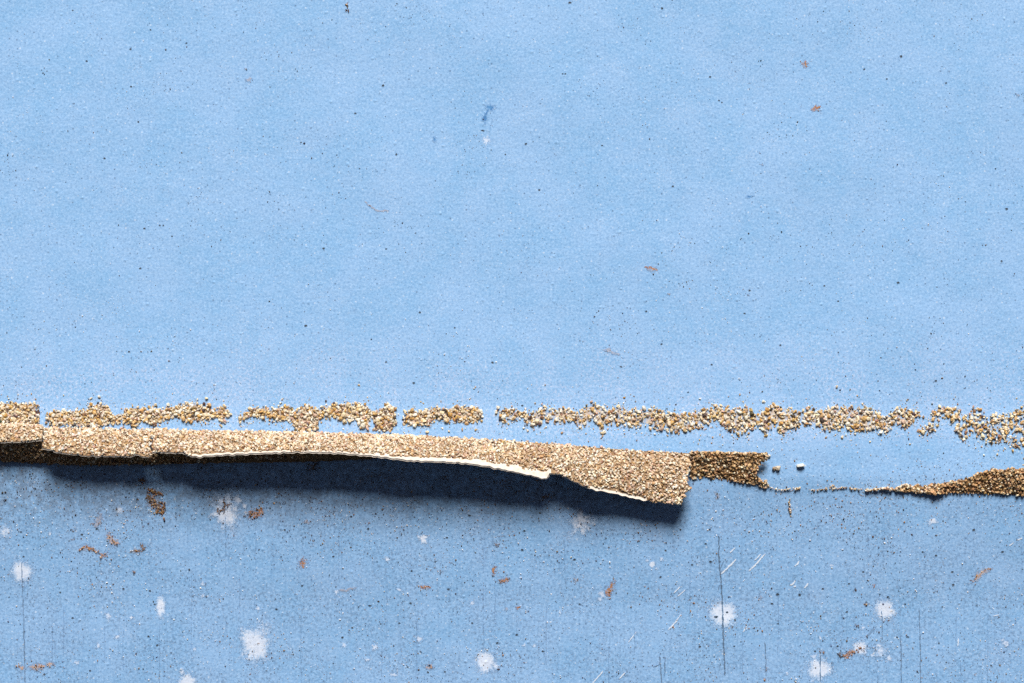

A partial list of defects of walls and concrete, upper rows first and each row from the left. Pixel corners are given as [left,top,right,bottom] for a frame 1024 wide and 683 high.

water stain [7,554,36,586]
water stain [233,606,278,680]
water stain [703,595,744,630]
water stain [851,594,903,661]
water stain [470,649,500,675]